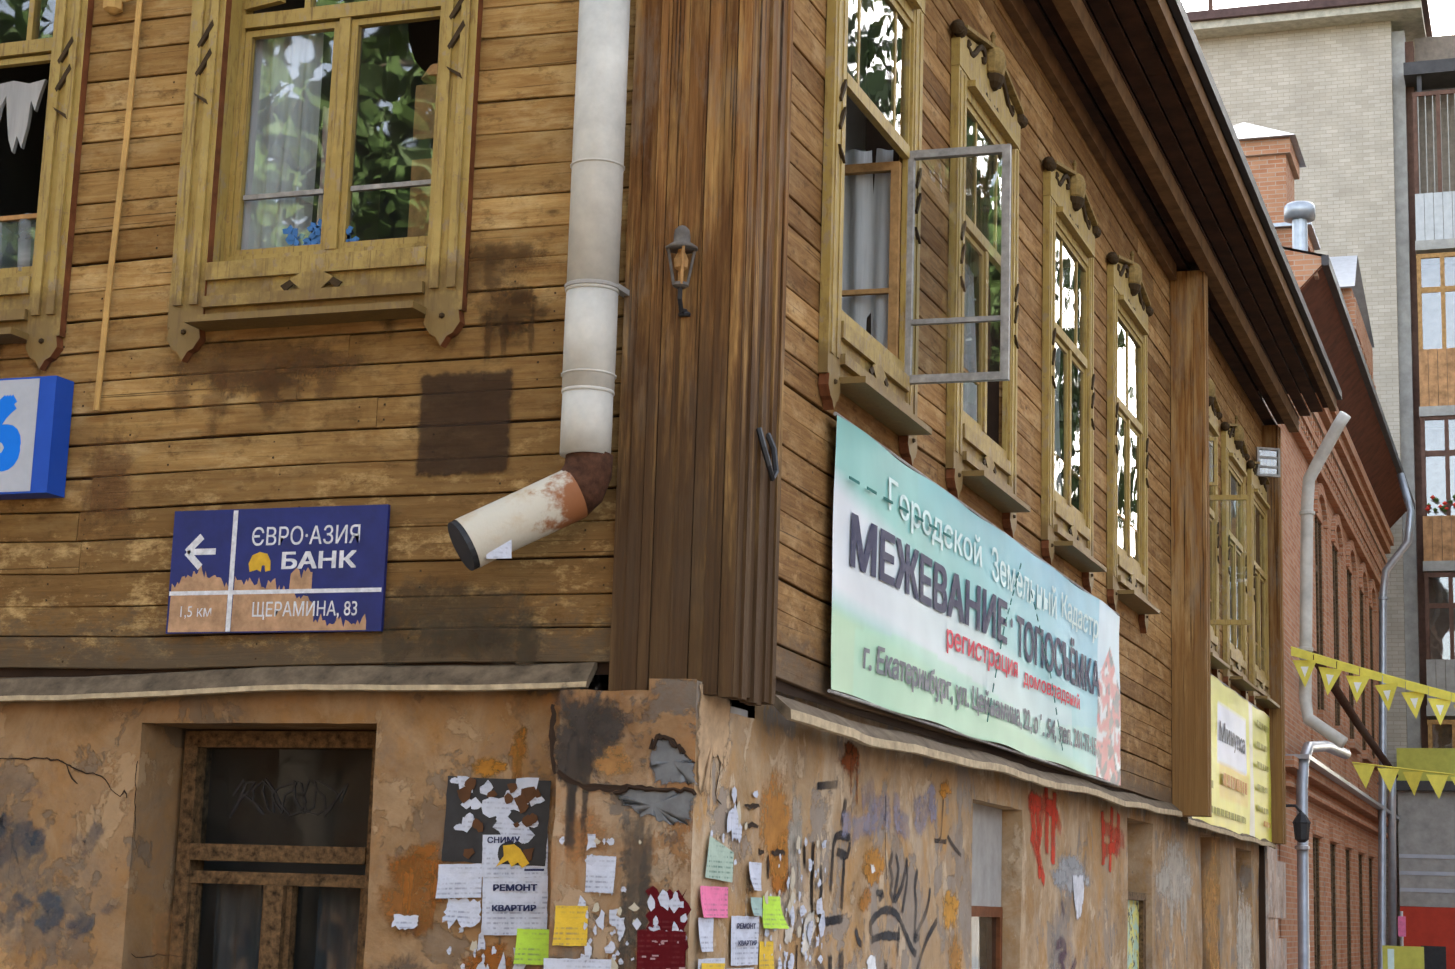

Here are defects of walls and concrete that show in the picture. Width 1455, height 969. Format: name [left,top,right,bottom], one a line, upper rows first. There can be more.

crack [0,757,138,844]
flaking render [594,684,731,825]